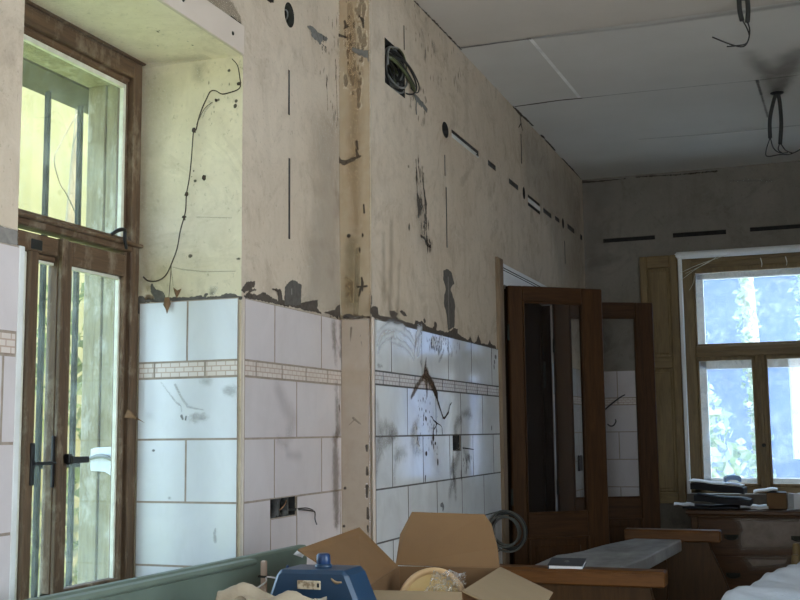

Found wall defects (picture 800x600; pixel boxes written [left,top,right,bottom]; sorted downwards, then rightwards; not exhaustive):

leakage [408,157,431,252]
peeling [138,280,496,349]